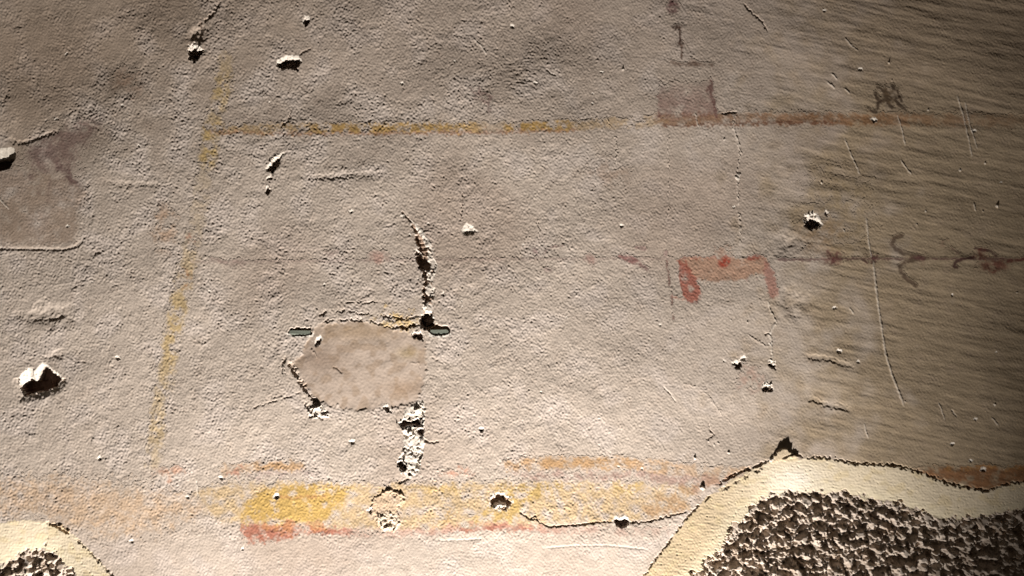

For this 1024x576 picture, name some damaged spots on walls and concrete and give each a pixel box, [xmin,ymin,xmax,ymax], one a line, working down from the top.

spalling [304,401,329,421]
crack [397,400,440,484]
crack [520,452,1024,576]